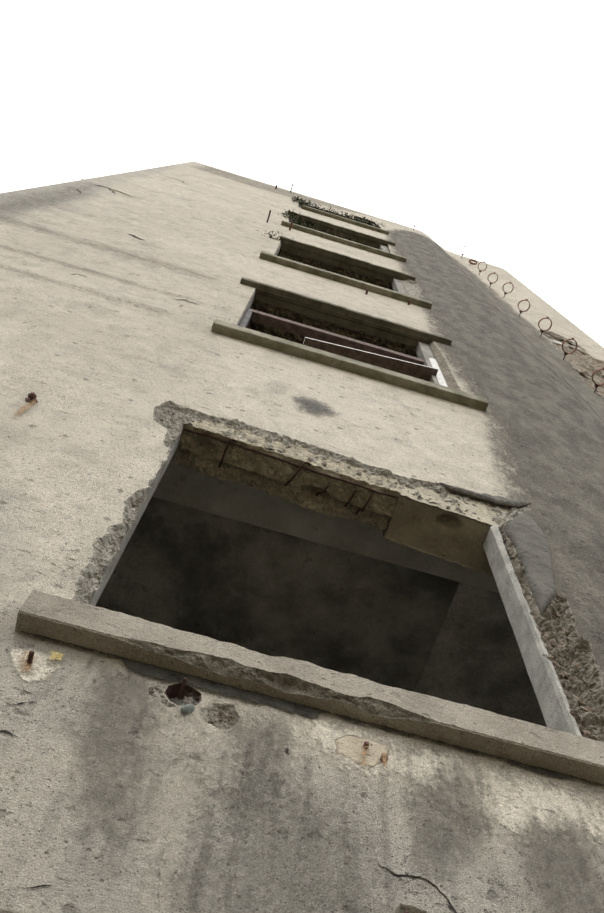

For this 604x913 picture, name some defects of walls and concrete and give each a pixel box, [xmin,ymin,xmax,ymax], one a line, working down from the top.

spalling [533,327,604,398]
spalling [71,400,604,742]
damp [226,706,604,913]
crack [378,860,462,913]